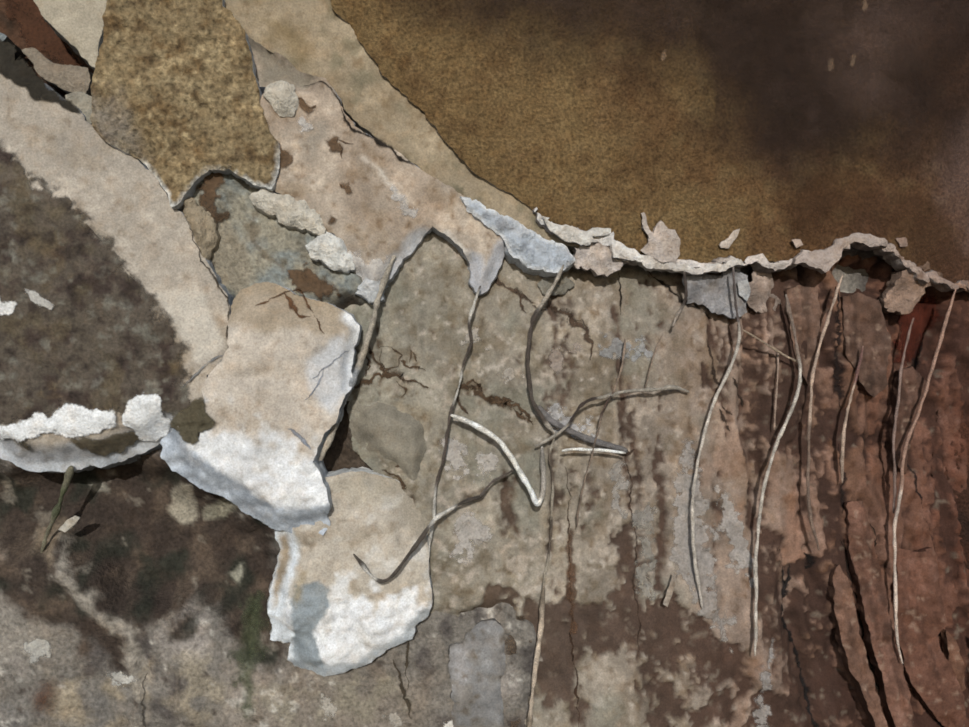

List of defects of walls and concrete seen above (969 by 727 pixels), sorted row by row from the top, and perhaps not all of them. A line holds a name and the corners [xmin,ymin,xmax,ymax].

leakage [465,0,969,167]
leakage [0,148,192,442]
spalling [205,258,234,314]
rust [495,277,594,360]
rust [893,294,940,366]
spalling [319,70,969,727]
spalling [46,444,163,473]
rust [565,530,577,634]
leakage [24,639,51,663]
leakage [112,671,134,686]
crack [393,640,411,717]